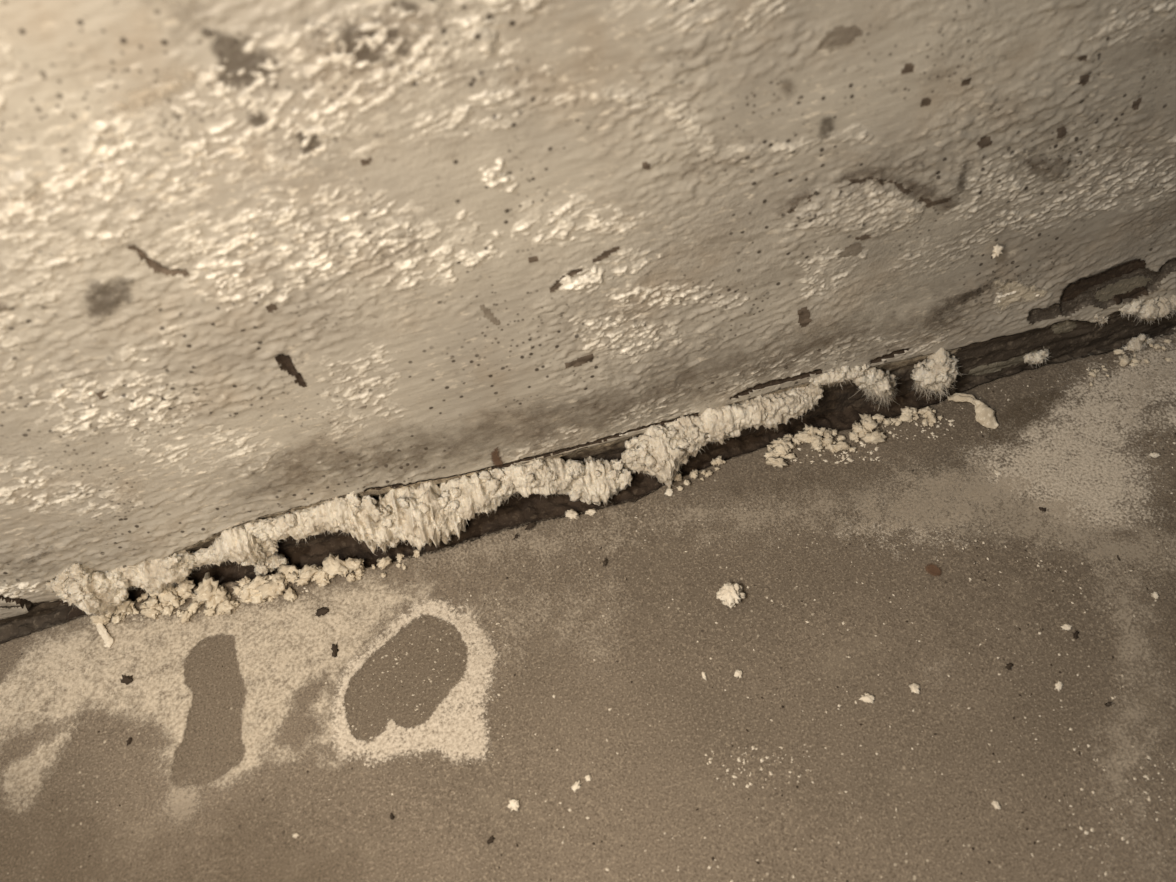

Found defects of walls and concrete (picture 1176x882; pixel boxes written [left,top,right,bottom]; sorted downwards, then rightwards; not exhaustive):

peeling [991,244,1005,259]
crack [480,305,500,325]
crack [870,349,909,364]
spalling [941,258,1176,430]
crack [730,369,822,399]
crack [364,413,699,492]
water stain [0,294,1176,882]
crack [0,595,68,620]